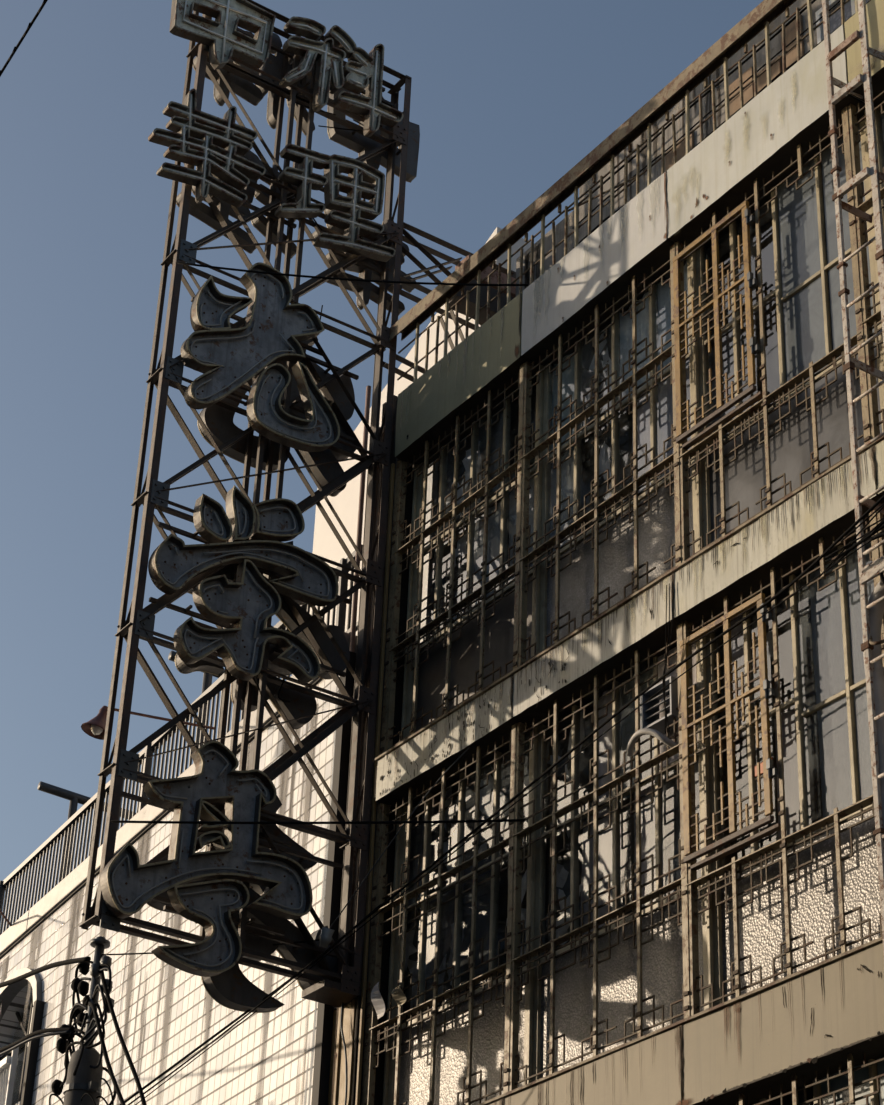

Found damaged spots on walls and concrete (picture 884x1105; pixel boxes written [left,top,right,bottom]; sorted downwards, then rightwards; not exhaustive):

water stain [682,69,721,135]
water stain [448,445,876,733]
peeling [380,690,497,795]